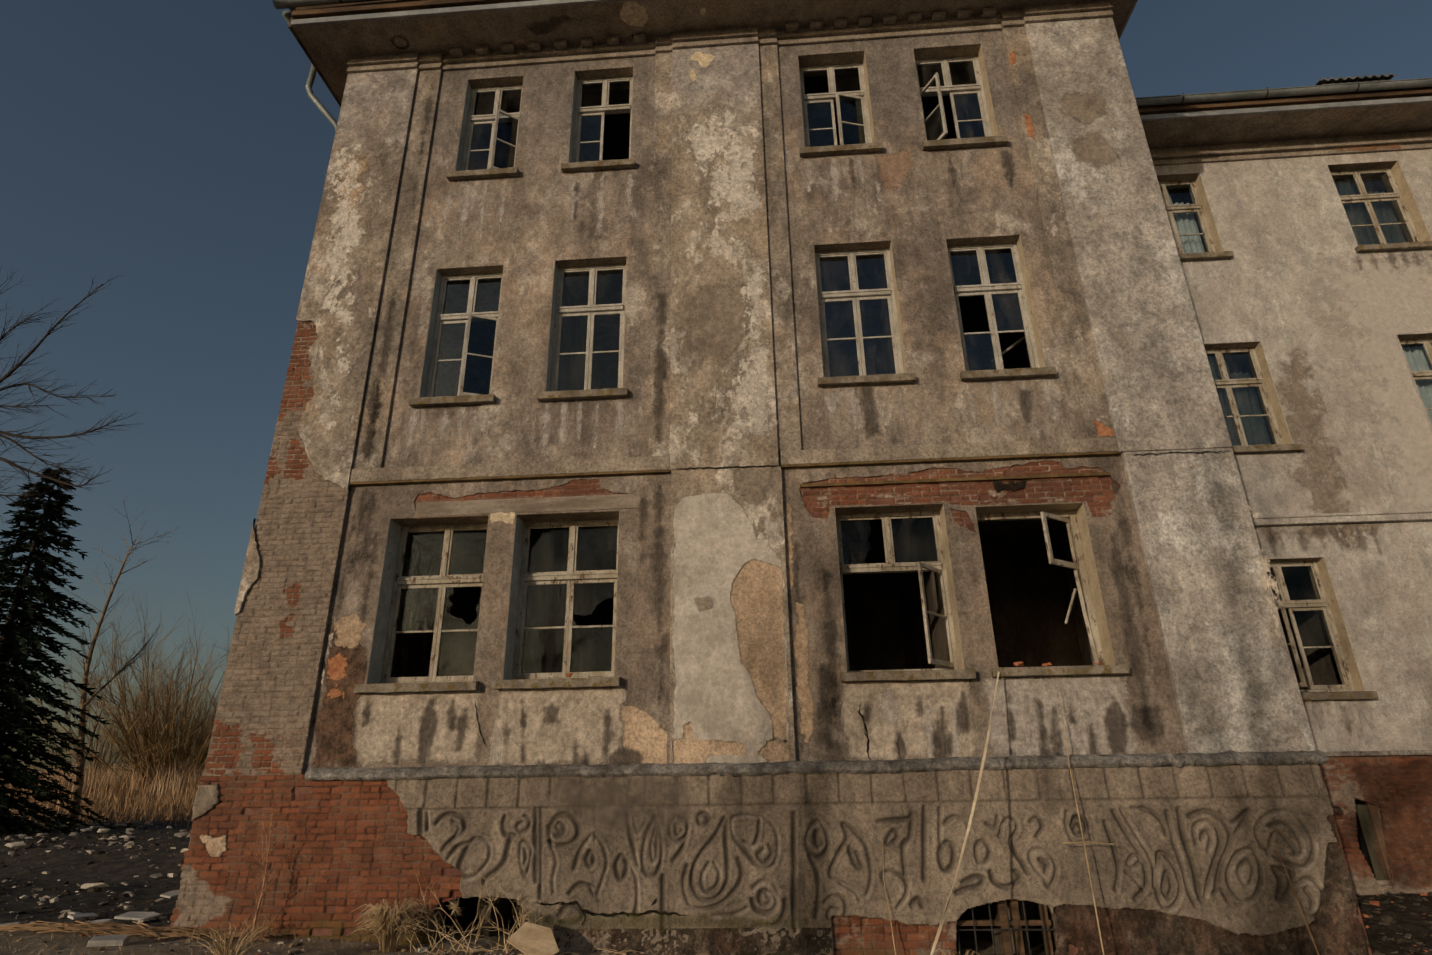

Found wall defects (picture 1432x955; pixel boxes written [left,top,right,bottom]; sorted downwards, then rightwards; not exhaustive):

leakage [654,284,753,441]
flaking render [170,128,462,945]
leakage [312,492,641,801]
leakage [639,485,668,660]
spalling [620,458,1120,764]
leakage [819,514,1164,760]
crack [533,897,687,925]
spalling [831,916,957,955]